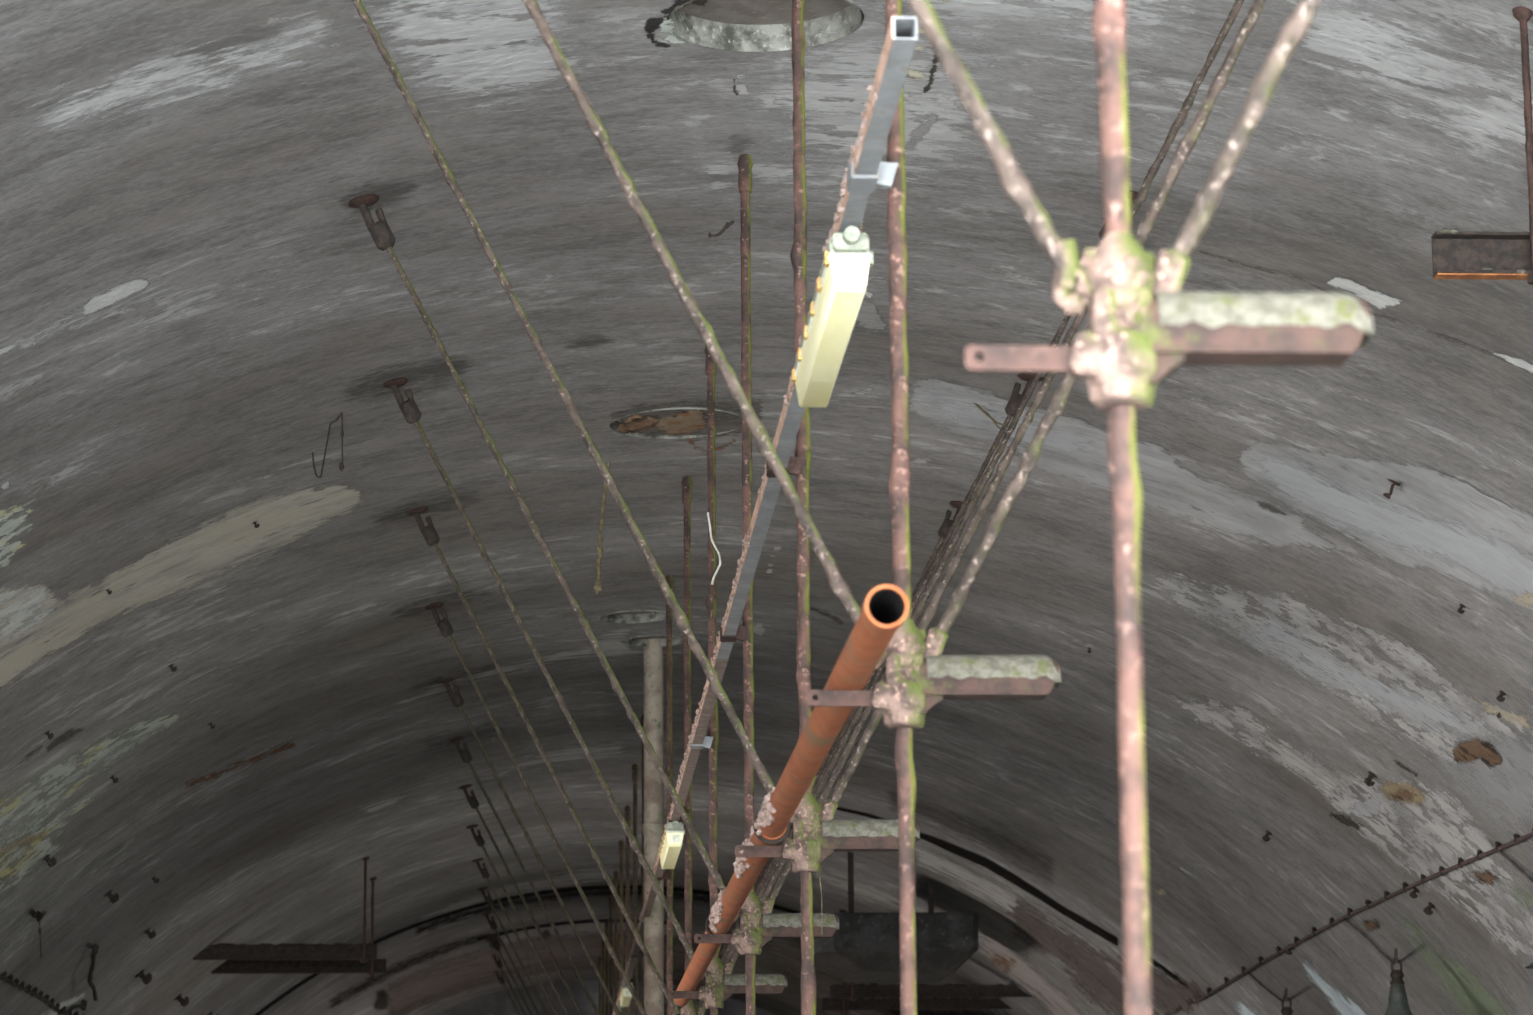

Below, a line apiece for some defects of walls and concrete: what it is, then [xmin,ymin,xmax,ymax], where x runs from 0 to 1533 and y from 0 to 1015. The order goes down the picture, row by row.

peeling [0,481,361,687]
peeling [909,379,1111,493]
peeling [1136,440,1533,610]
peeling [1148,573,1531,772]
peeling [1169,694,1533,970]